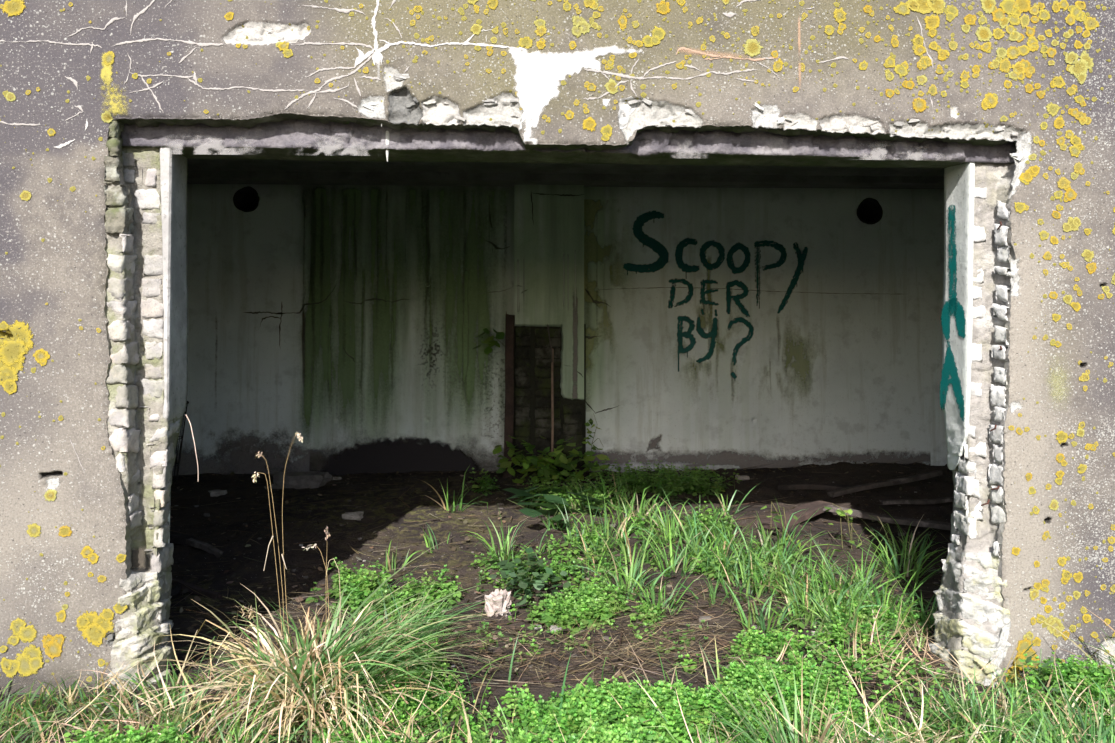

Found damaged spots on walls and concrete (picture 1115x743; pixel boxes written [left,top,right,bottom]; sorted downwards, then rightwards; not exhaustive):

crack [0,0,524,111]
spalling [223,22,311,46]
crack [0,76,88,148]
spalling [358,67,522,127]
spalling [621,98,703,143]
water stain [302,187,506,433]
spalling [984,621,1011,687]
spalling [1096,637,1115,670]